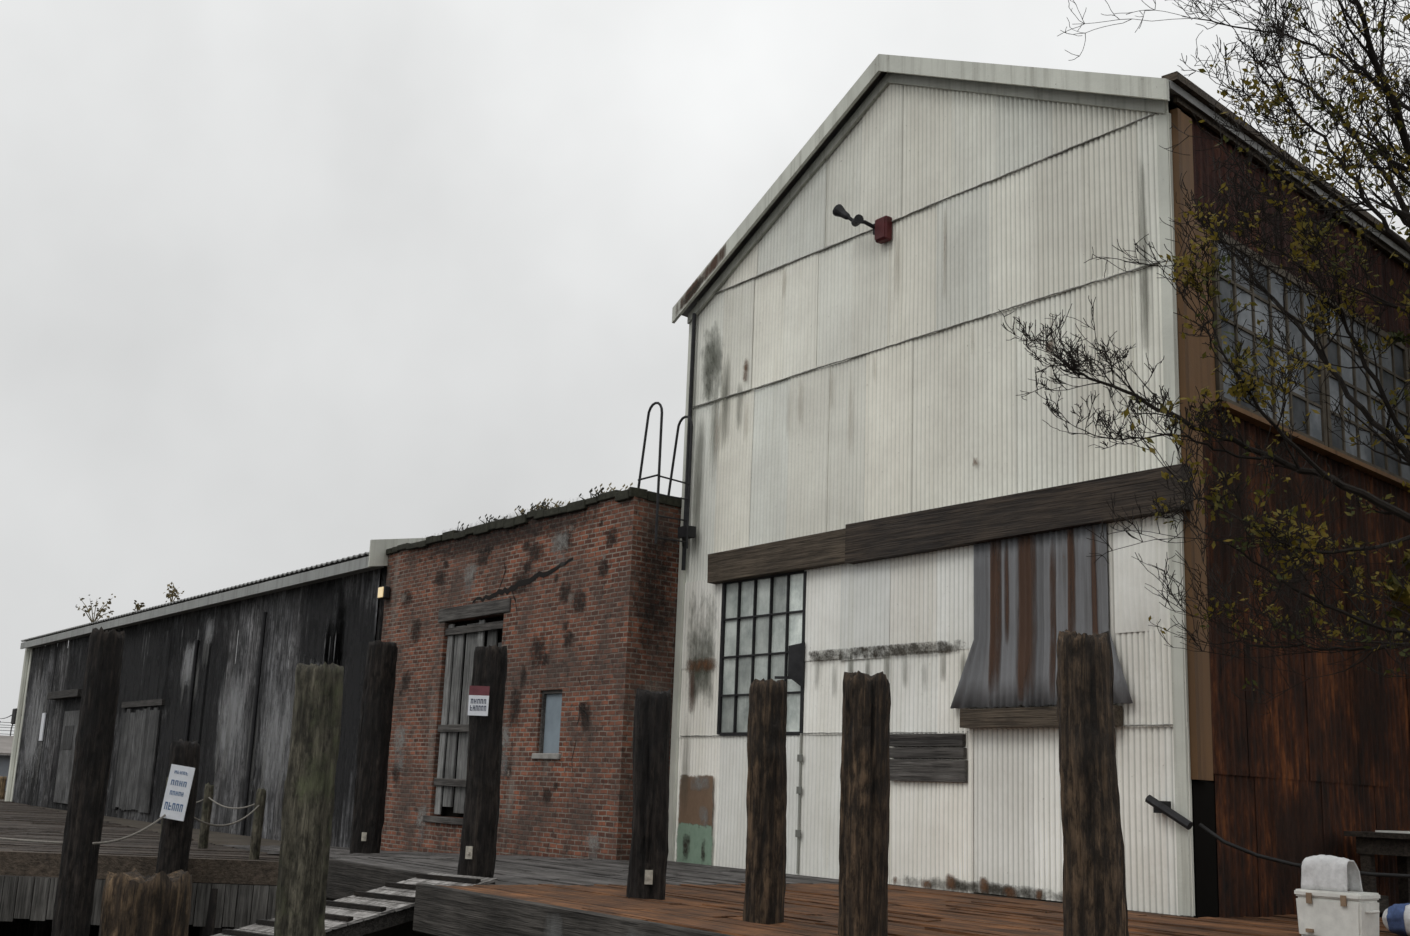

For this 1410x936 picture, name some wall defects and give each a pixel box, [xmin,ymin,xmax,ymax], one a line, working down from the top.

water stain [694,336,728,516]
water stain [418,507,588,560]
crack [472,551,573,614]
water stain [636,529,673,657]
water stain [689,630,713,694]
corrosion [988,528,1098,699]